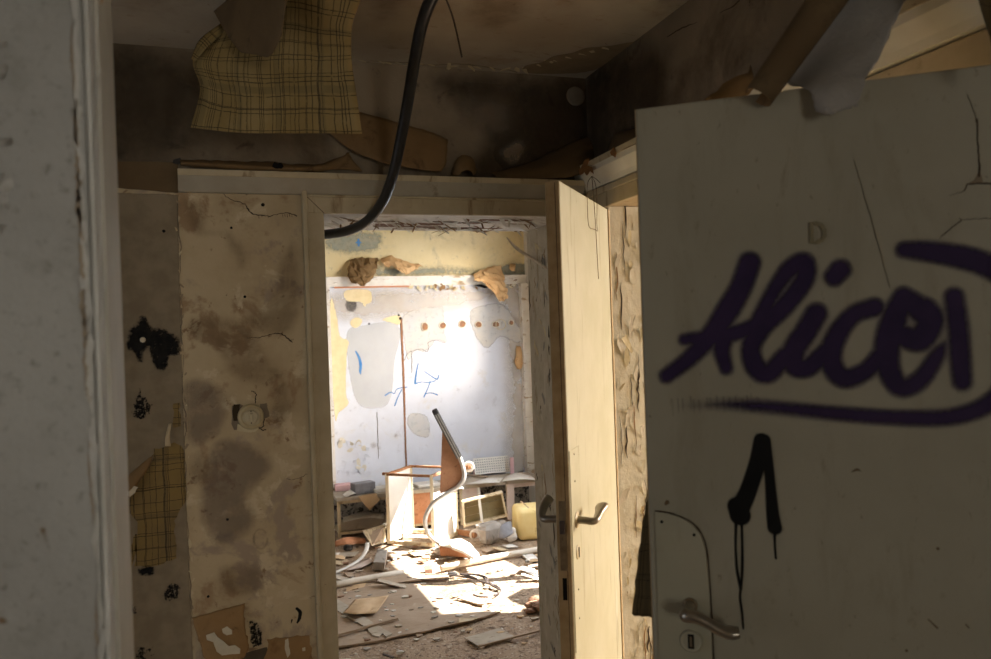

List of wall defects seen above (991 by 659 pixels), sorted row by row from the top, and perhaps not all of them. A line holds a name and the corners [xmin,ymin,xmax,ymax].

crack [953,95,991,195]
crack [224,194,297,218]
peeling [408,282,486,292]
peeling [501,264,547,310]
peeling [330,289,520,421]